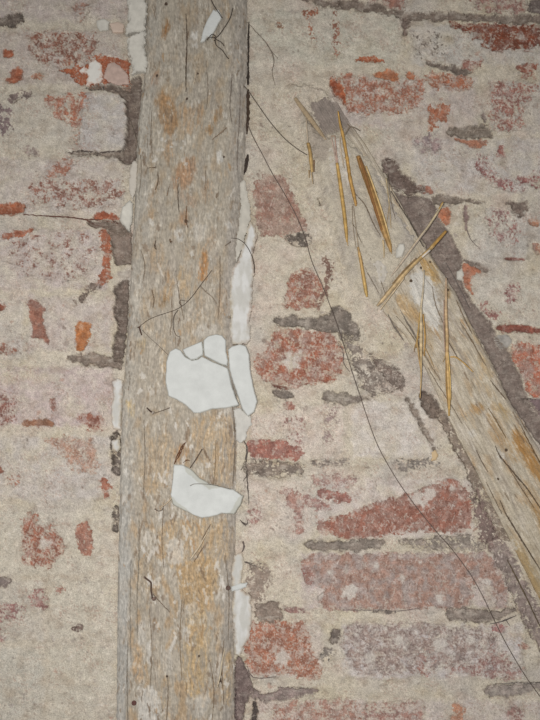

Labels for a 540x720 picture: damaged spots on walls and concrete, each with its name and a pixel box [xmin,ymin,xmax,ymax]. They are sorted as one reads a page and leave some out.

peeling [329,0,540,155]
spalling [282,266,325,311]
spalling [253,327,345,390]
spalling [279,391,540,682]
spalling [234,606,323,720]